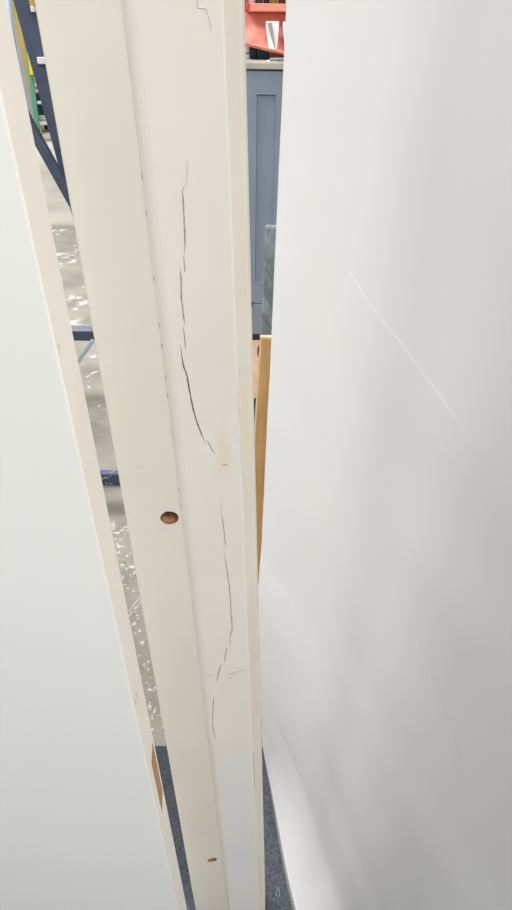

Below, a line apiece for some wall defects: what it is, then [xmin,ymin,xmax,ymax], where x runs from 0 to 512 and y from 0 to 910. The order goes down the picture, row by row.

crack [121,0,233,906]